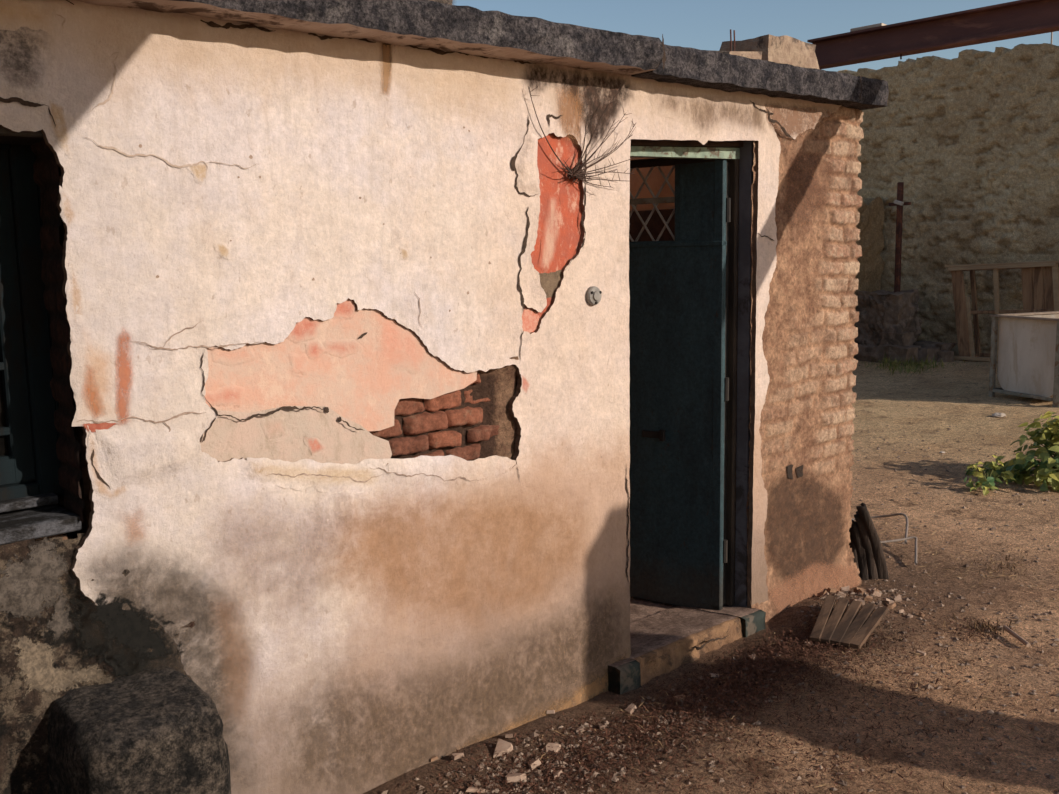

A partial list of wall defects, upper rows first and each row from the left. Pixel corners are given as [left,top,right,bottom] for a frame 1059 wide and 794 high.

crack [0,97,56,126]
crack [85,52,256,171]
damp [0,0,629,154]
damp [643,83,833,145]
peeling [522,133,582,333]
peeling [200,299,531,494]
damp [294,455,604,652]
damp [768,477,859,613]
flaking render [0,533,126,794]
damp [64,561,237,770]
damp [308,614,610,774]